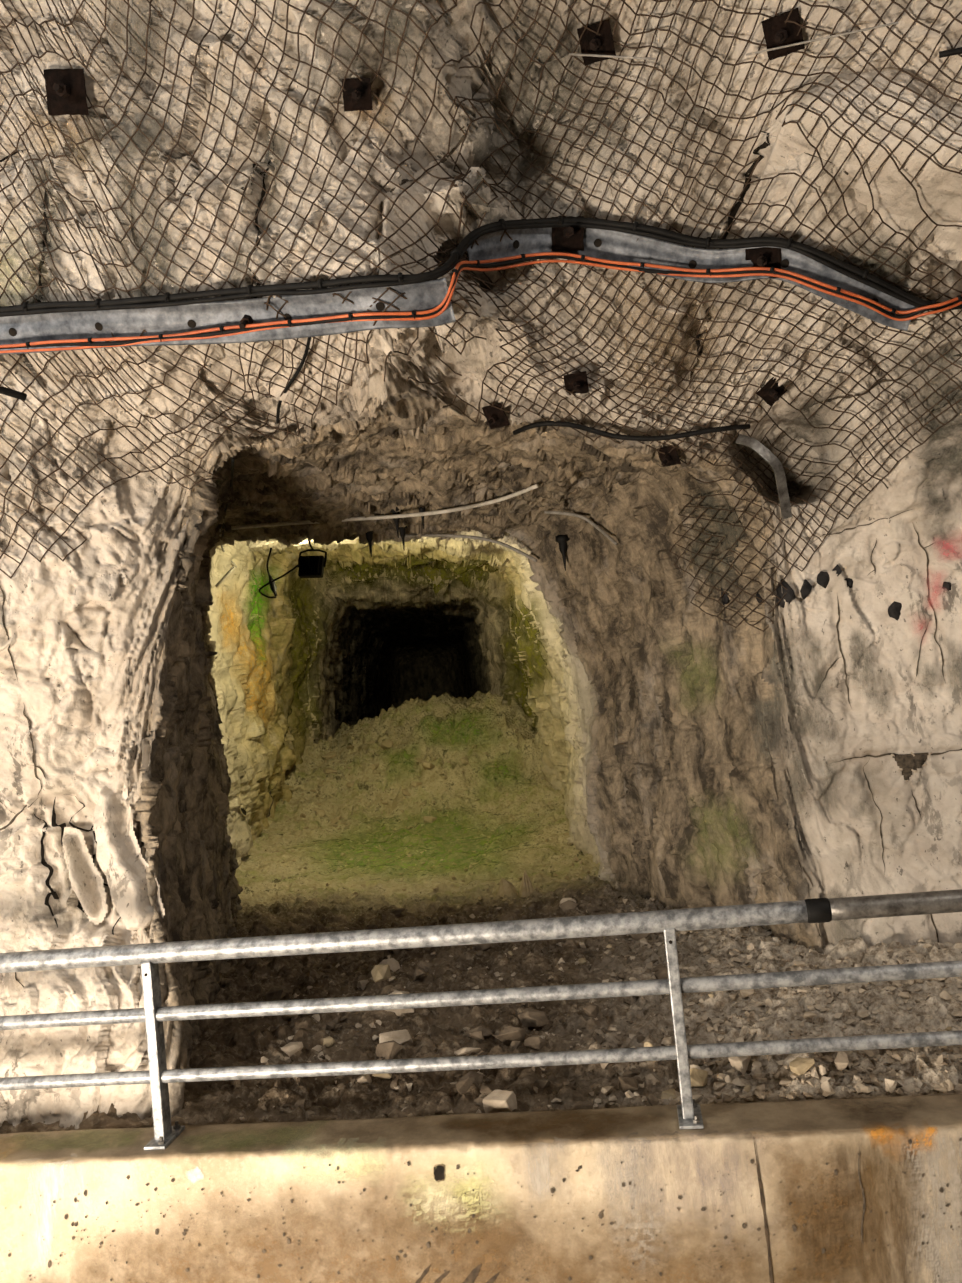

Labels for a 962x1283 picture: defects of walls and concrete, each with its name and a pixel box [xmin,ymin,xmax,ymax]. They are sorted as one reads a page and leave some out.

crack [819,595,852,709]
crack [810,509,946,683]
crack [0,585,121,936]
leakage [89,1197,754,1283]
leakage [779,1140,962,1283]